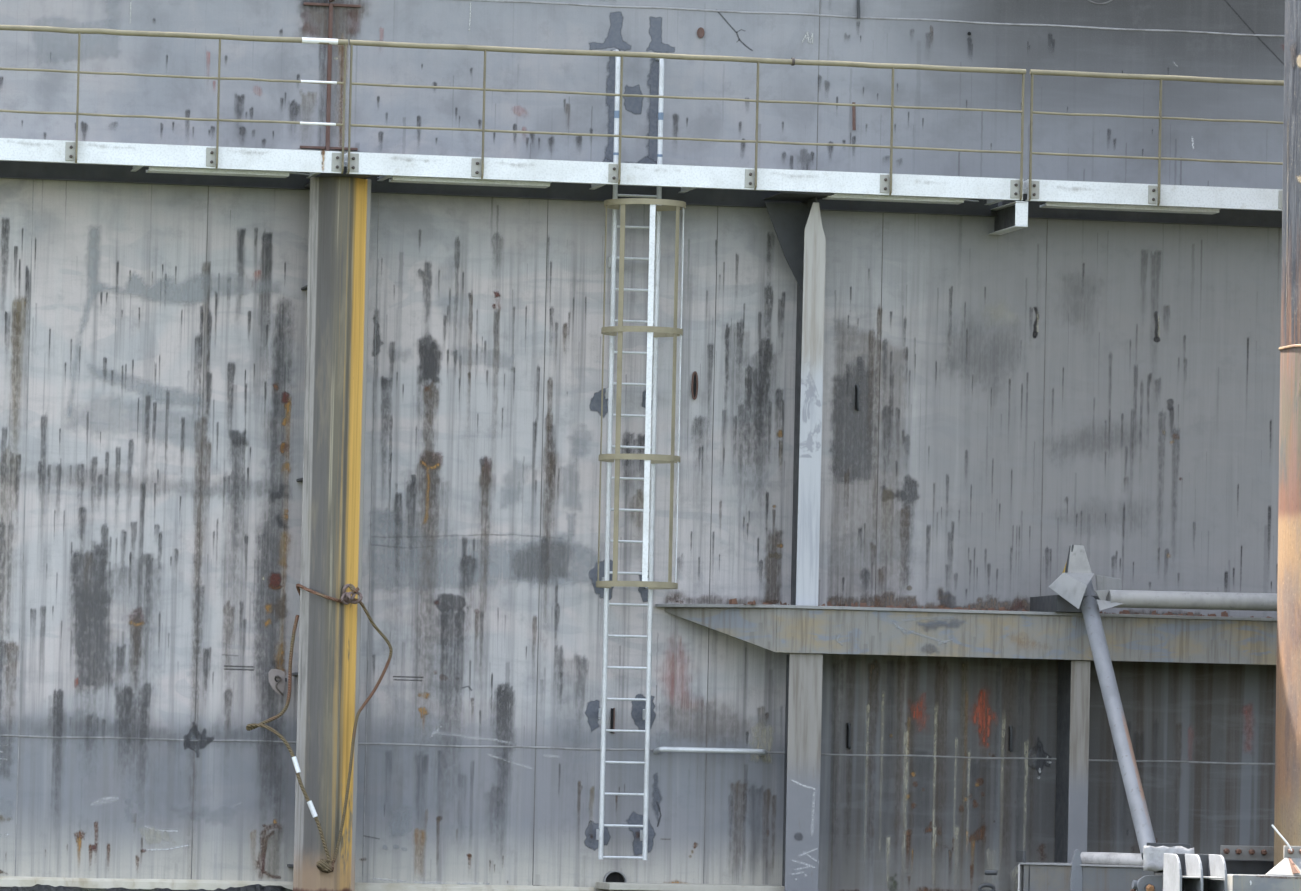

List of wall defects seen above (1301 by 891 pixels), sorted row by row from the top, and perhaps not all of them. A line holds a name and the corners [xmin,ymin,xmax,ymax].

water stain [238,229,286,277]
water stain [2,219,36,445]
water stain [61,507,151,734]
water stain [81,432,178,573]
water stain [138,392,251,475]
water stain [228,363,266,407]
rust [256,304,291,786]
rust [395,453,441,545]
water stain [374,515,598,690]
water stain [833,308,908,483]
water stain [883,464,917,574]
rust [828,586,1030,611]